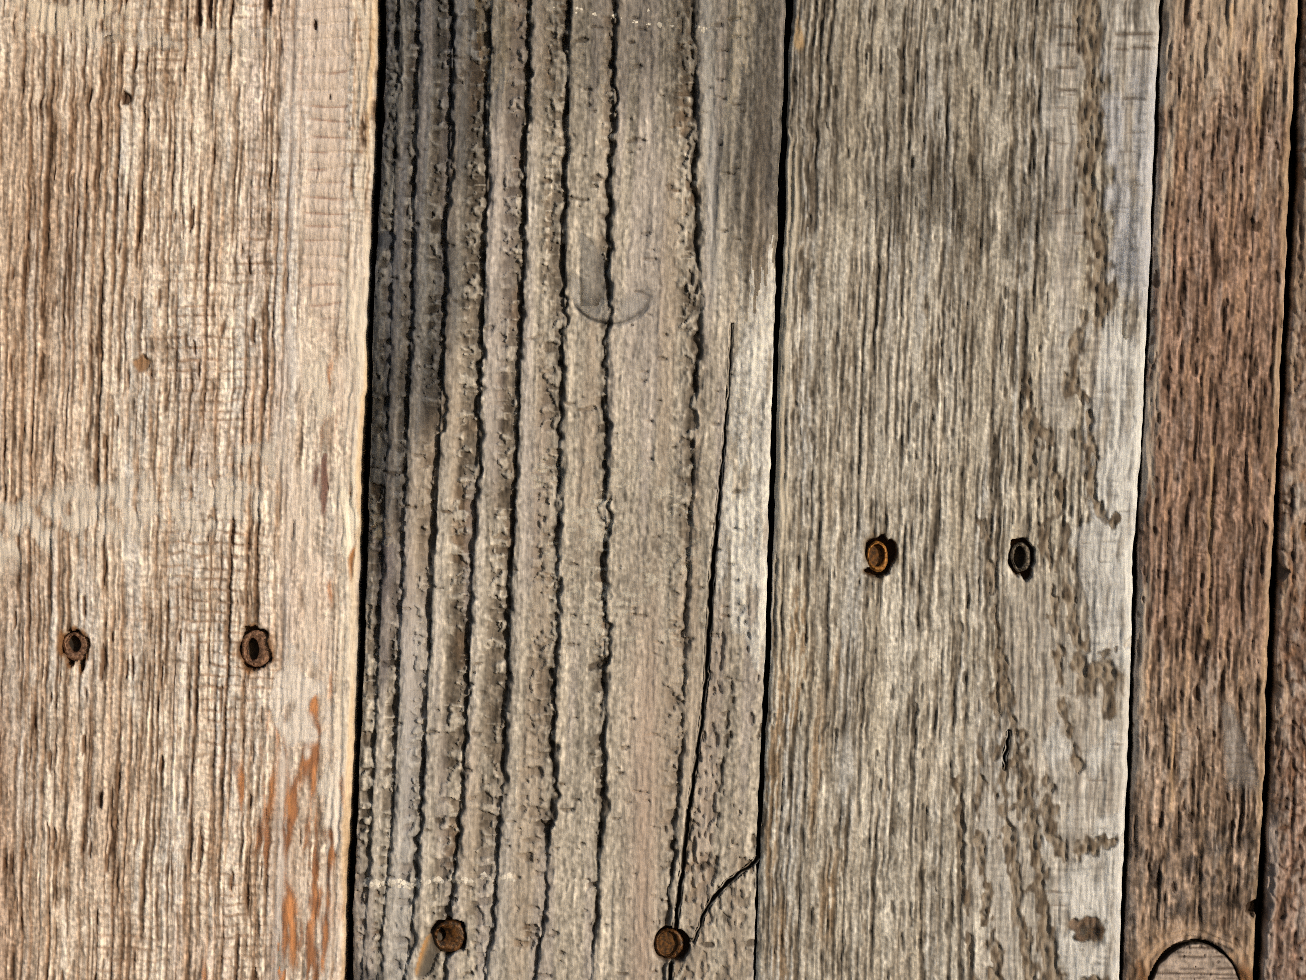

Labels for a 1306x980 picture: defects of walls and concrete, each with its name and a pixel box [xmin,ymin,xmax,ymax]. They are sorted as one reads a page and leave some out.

corrosion [258,694,336,980]
crack [667,324,760,980]